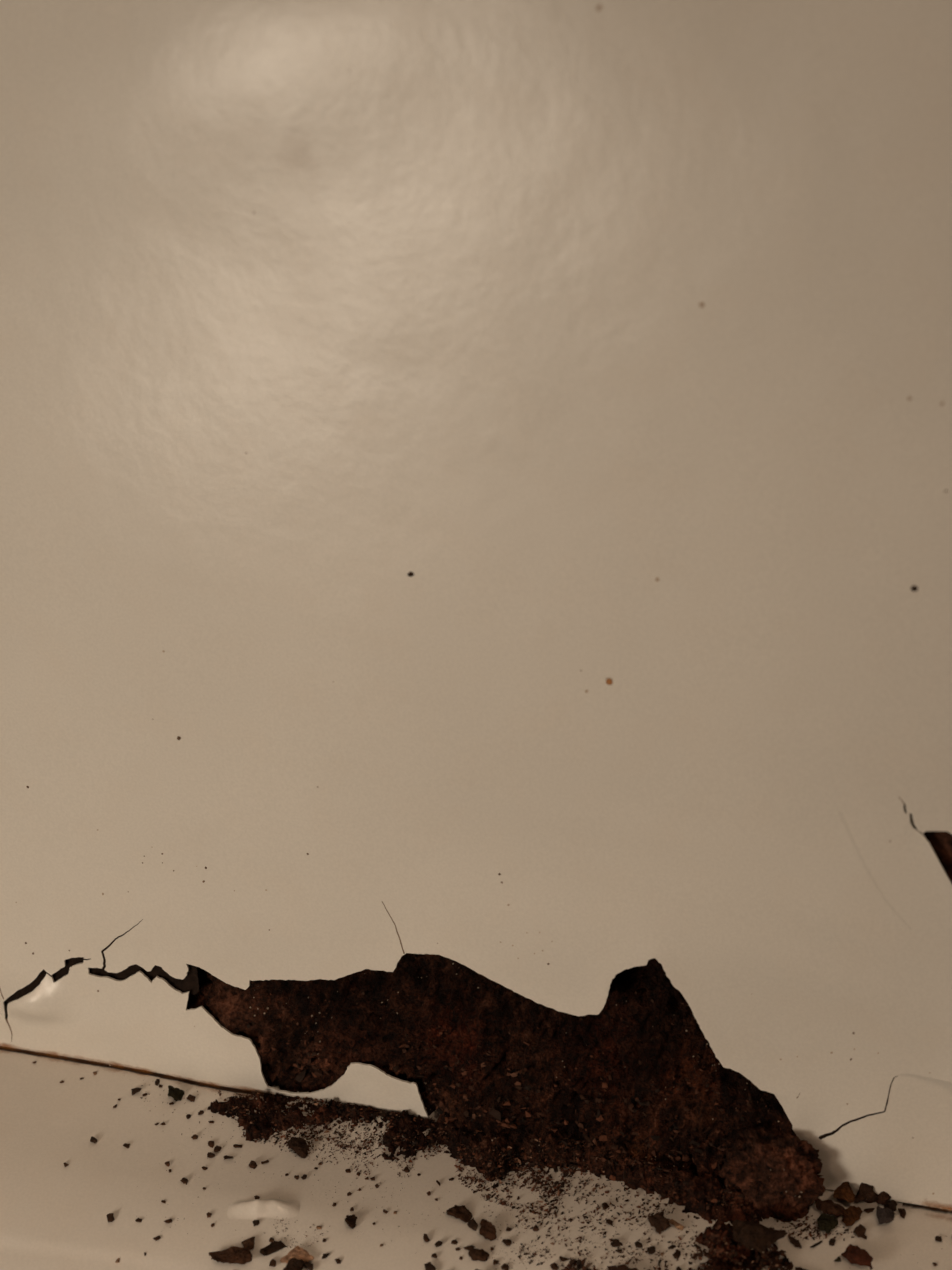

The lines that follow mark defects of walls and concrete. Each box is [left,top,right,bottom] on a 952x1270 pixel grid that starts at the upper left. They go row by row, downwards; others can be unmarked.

crack [0,919,199,1042]
peeling [189,819,952,1223]
crack [818,1076,897,1139]
peeling [854,1200,906,1238]